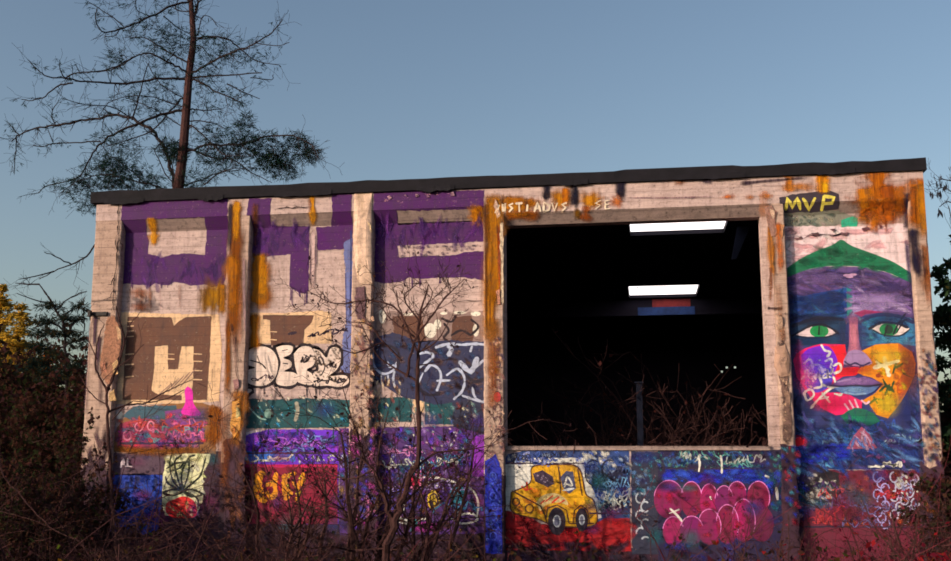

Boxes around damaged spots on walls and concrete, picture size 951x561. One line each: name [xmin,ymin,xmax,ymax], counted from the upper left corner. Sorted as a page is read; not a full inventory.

rust [147,218,158,244]
rust [552,188,621,222]
rust [853,172,931,290]
rust [197,201,271,483]
rust [470,195,539,404]
rust [117,446,196,456]